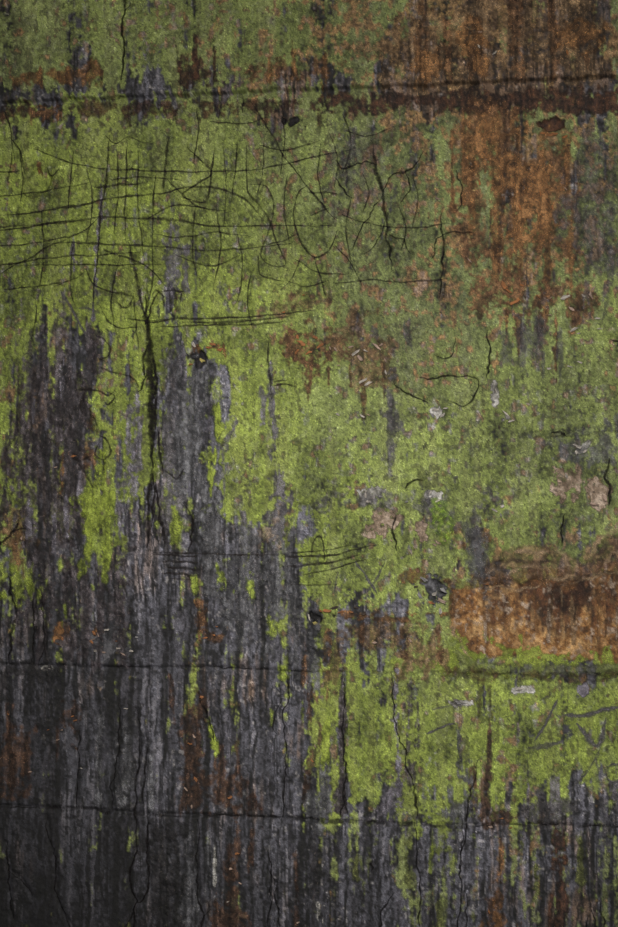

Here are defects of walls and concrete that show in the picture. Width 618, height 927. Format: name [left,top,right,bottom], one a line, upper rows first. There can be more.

corrosion [176,34,217,89]
corrosion [0,96,181,127]
corrosion [192,98,299,122]
corrosion [245,0,618,382]
spalling [187,342,225,369]
corrosion [323,520,618,698]
spalling [79,621,138,662]
corrosion [468,688,518,830]